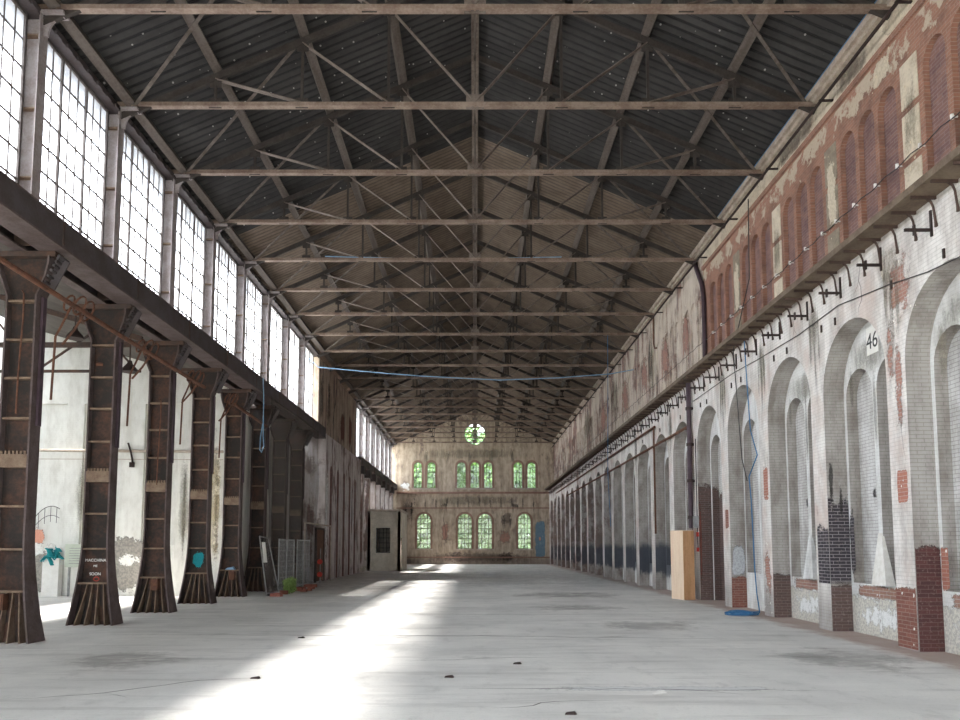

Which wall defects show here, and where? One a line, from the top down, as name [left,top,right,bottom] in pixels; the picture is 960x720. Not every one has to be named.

peeling [872,0,918,94]
peeling [824,156,837,239]
spalling [897,469,908,503]
peeling [115,536,143,593]
spalling [698,483,747,608]
spalling [831,545,960,655]